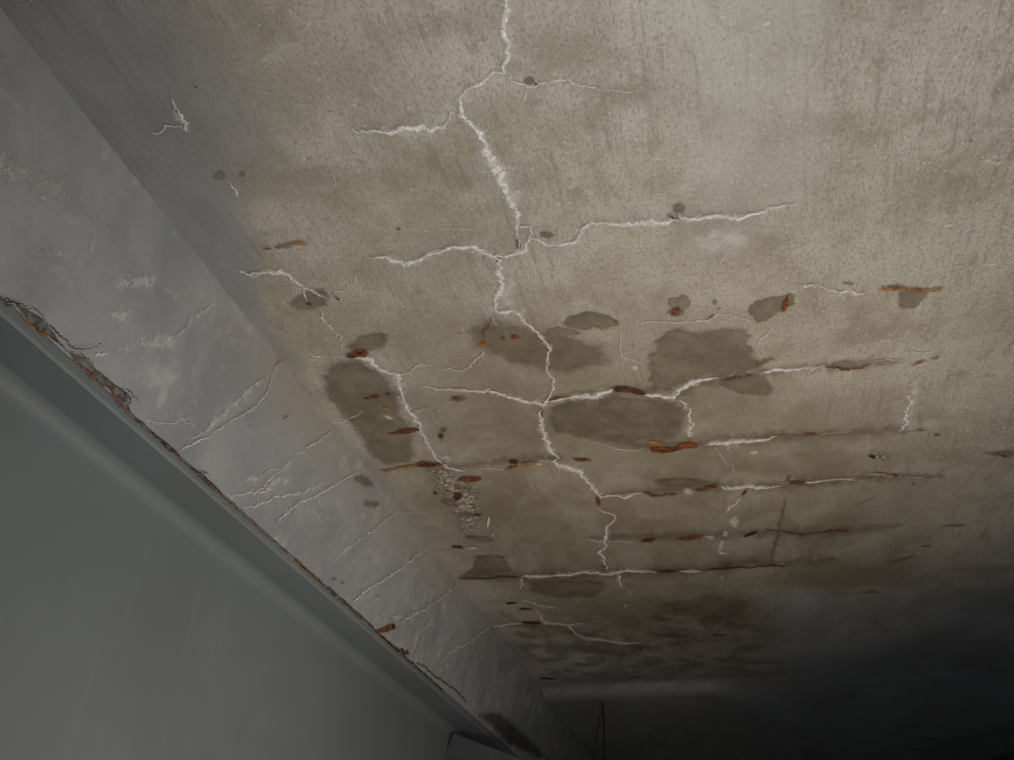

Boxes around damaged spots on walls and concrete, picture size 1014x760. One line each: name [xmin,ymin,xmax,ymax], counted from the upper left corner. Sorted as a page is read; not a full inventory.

crack [152,49,226,134]
water stain [460,311,619,375]
crack [227,0,946,662]
water stain [667,295,691,317]
water stain [748,293,795,323]
corrosion [878,286,945,310]
water stain [319,333,419,466]
water stain [547,326,775,442]
spalling [0,295,467,703]
spalling [425,468,494,543]
corrosion [379,452,592,502]
water stain [717,490,748,555]